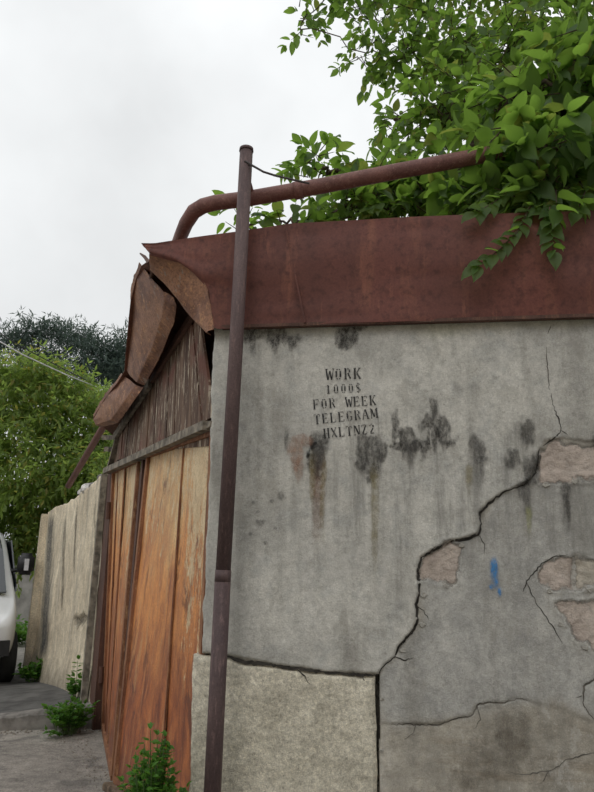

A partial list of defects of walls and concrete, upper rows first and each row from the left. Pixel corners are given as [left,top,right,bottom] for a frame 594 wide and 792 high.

water stain [355,402,455,481]
water stain [506,449,541,504]
water stain [521,420,534,444]
spalling [538,439,594,488]
crack [227,326,568,792]
spalling [419,540,462,589]
spalling [537,556,594,593]
crack [576,679,594,718]
crack [506,753,591,781]